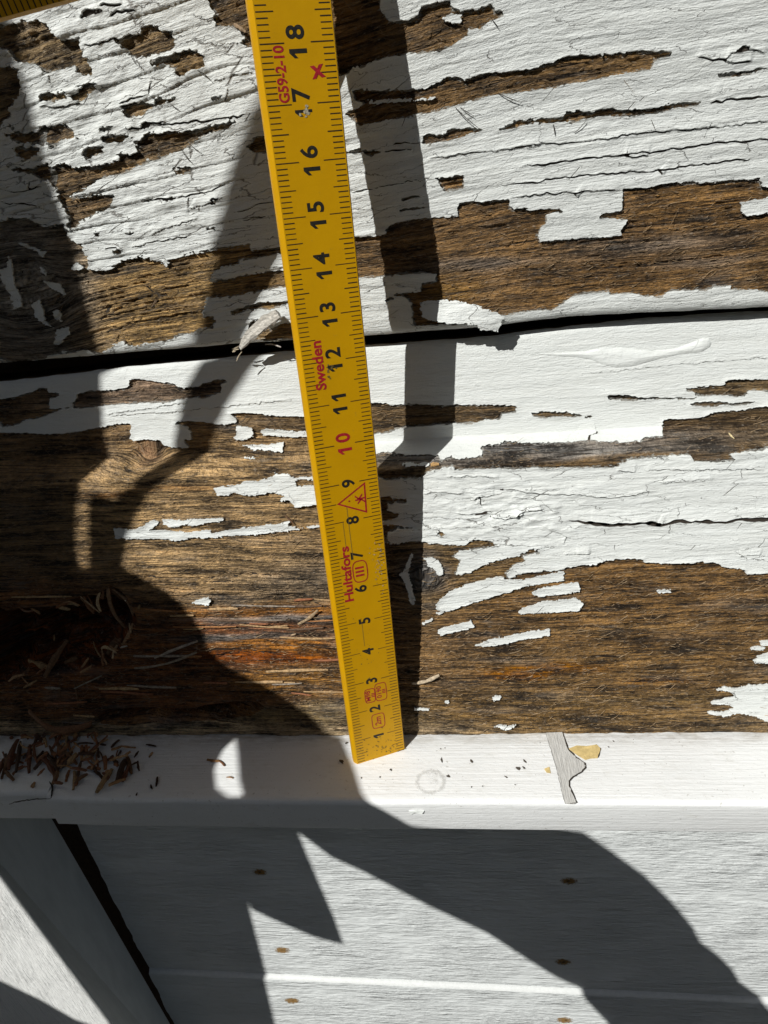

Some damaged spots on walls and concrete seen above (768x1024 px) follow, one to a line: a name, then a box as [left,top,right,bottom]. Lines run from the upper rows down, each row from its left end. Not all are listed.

crack [81,3,135,47]
peeling [0,19,293,362]
crack [122,85,244,130]
crack [106,185,273,253]
peeling [345,50,671,126]
crack [352,96,768,197]
peeling [355,178,768,332]
crack [698,48,761,64]
peeling [371,379,768,480]
crack [427,470,768,540]
peeling [0,379,349,736]
peeling [380,496,768,804]